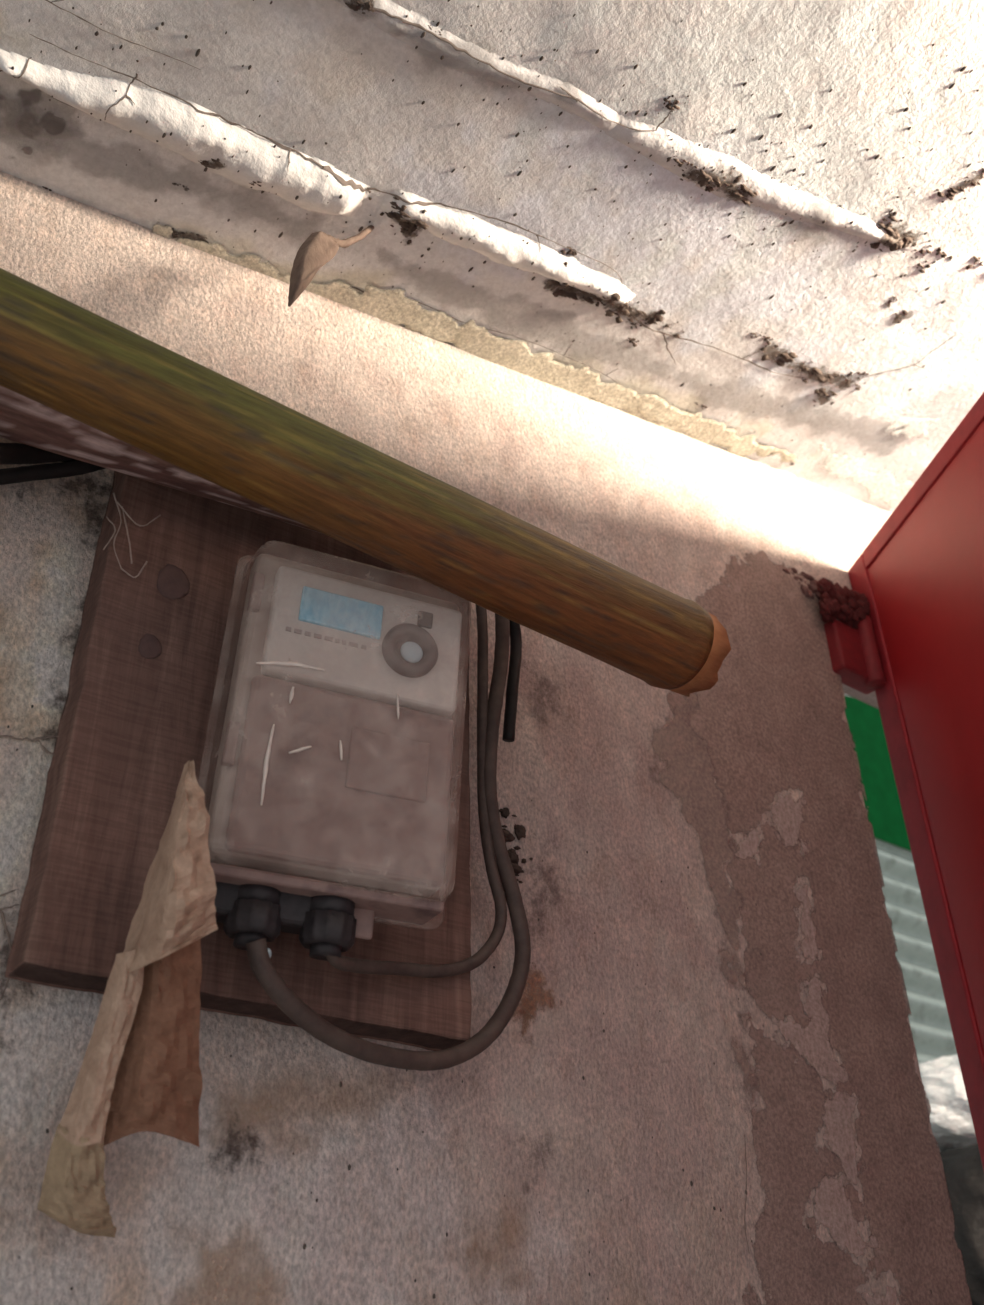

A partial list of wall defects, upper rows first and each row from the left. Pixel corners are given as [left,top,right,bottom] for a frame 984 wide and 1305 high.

leakage [18,90,65,154]
crack [0,0,811,383]
flaking render [782,567,820,606]
peeling [735,791,808,859]
crack [0,889,21,1001]
peeling [766,977,858,1184]